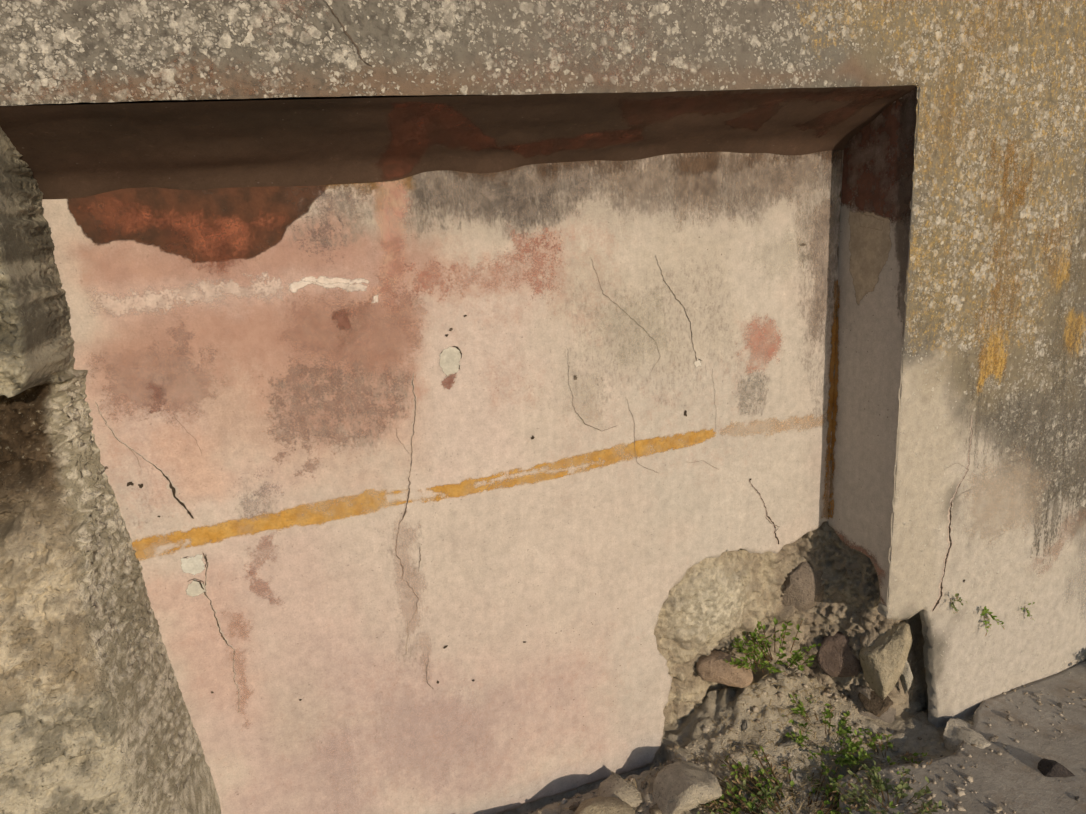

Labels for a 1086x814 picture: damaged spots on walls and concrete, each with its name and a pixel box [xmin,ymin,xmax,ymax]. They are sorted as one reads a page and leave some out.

spalling [439,328,462,376]
crack [95,401,195,519]
spalling [180,554,207,597]
crack [187,552,240,713]
crack [394,373,431,687]
spalling [654,521,927,724]
crack [931,415,976,612]